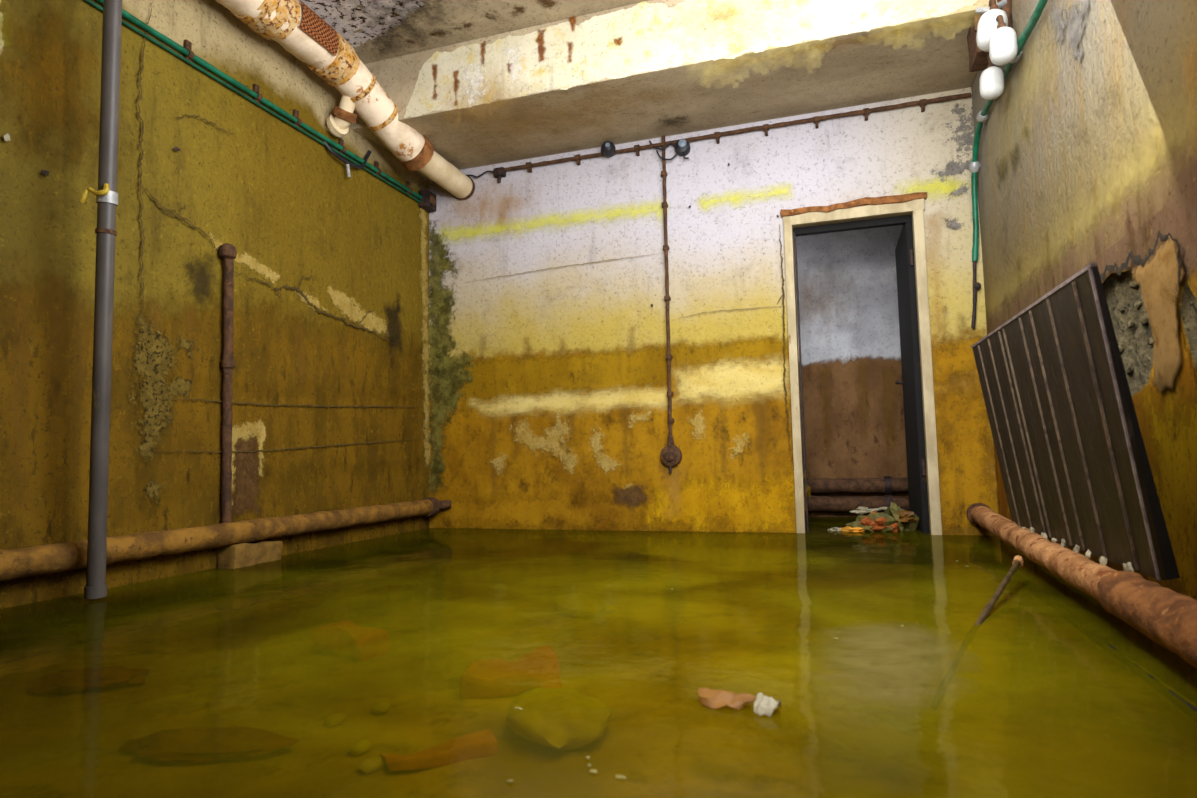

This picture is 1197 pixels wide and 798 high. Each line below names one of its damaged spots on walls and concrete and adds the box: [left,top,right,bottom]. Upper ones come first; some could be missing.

peeling [298,0,426,53]
corrosion [536,29,546,61]
corrosion [568,16,576,62]
crack [137,3,396,346]
damp [0,282,94,550]
damp [107,208,909,556]
peeling [510,412,578,474]
damp [931,131,1197,534]
damp [1048,312,1197,600]
spalling [1102,270,1154,397]
spalling [1180,283,1197,370]
damp [105,548,217,588]